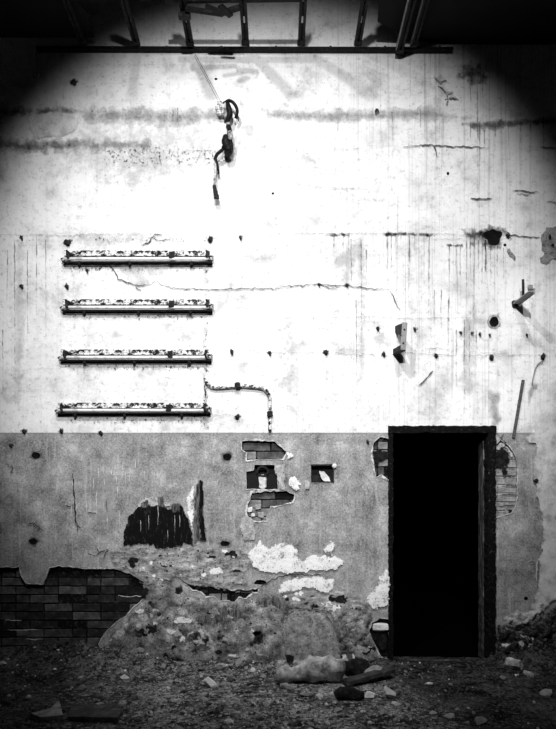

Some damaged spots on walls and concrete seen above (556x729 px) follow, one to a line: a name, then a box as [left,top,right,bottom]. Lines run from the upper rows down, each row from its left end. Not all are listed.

damp [86,109,218,122]
damp [271,110,442,121]
damp [462,117,556,143]
crack [403,144,485,156]
damp [540,226,556,265]
crack [100,264,469,319]
flaking render [240,439,294,462]
flaking render [371,437,389,481]
flaking render [245,487,295,523]
peeling [495,425,556,655]
flaking render [0,540,390,662]